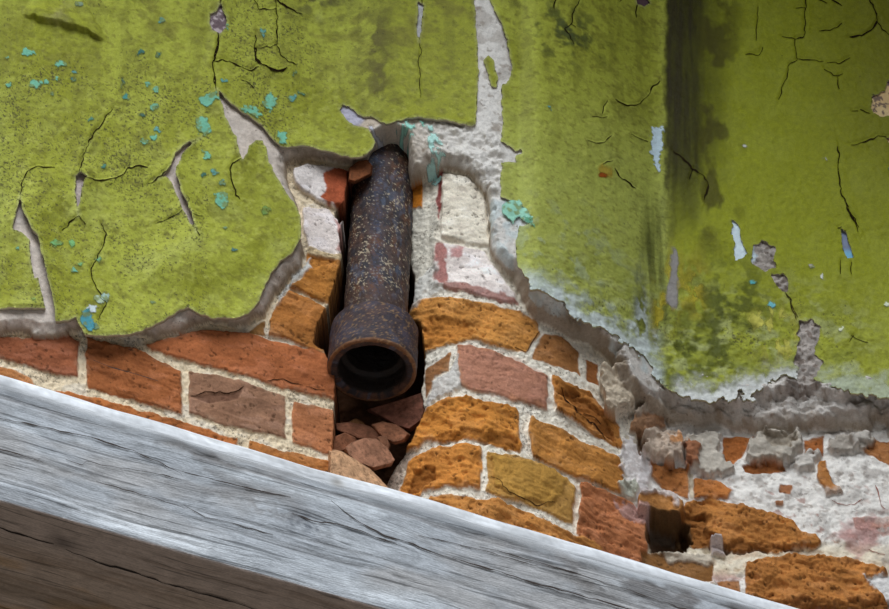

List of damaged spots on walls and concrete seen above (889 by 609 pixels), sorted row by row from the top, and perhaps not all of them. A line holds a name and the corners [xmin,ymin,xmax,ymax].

spalling [29,60,77,96]
peeling [210,6,228,33]
crack [212,0,302,88]
damp [664,0,704,190]
crack [778,0,888,100]
crack [79,109,171,184]
crack [837,135,886,231]
crack [62,216,107,318]
spalling [0,91,354,472]
damp [528,276,660,380]
spalling [337,0,889,609]
efflorescence [677,368,798,403]